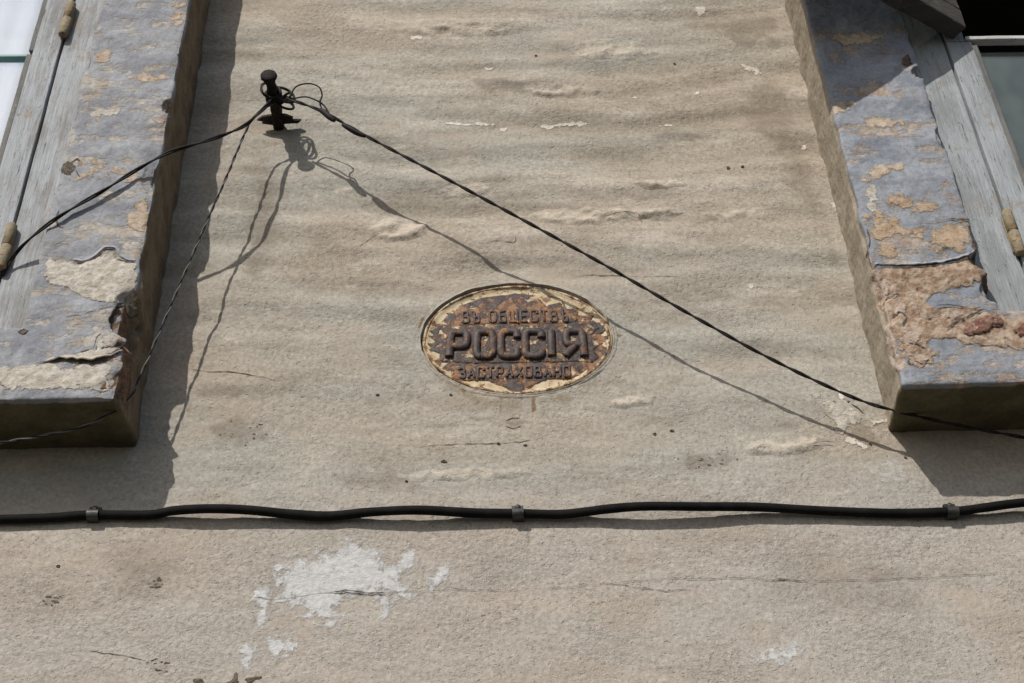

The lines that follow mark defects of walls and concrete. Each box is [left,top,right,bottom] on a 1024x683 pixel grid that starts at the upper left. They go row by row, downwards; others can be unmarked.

peeling [830,100,857,122]
peeling [0,245,144,410]
peeling [861,163,1024,372]
peeling [228,535,419,683]
peeling [427,566,451,592]